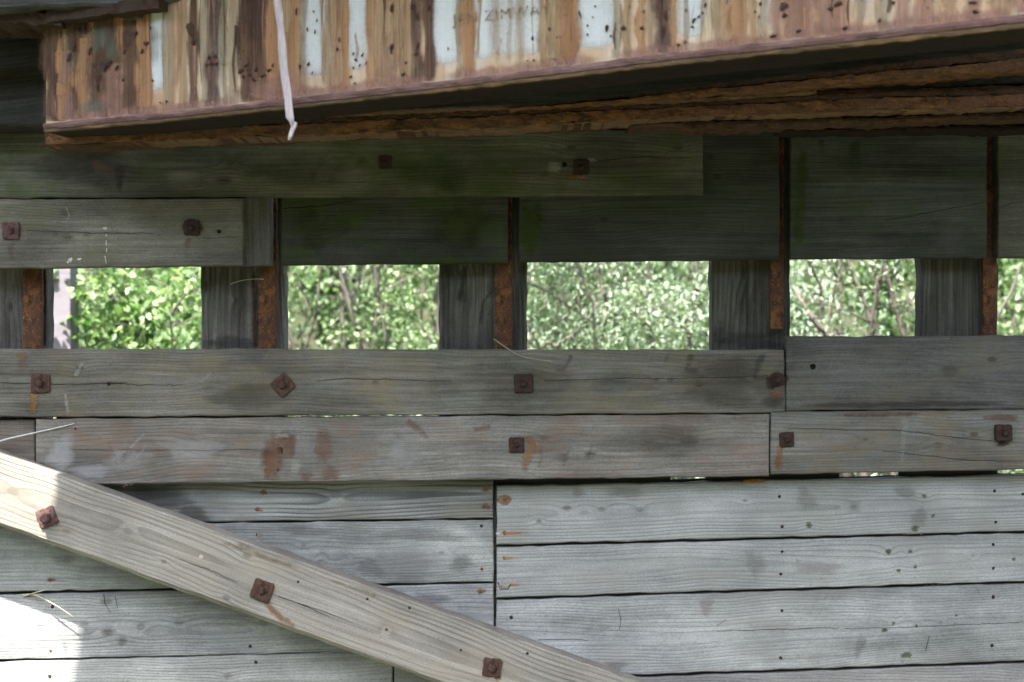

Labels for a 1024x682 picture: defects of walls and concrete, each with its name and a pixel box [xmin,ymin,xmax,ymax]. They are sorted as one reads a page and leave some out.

corrosion [263,433,294,477]